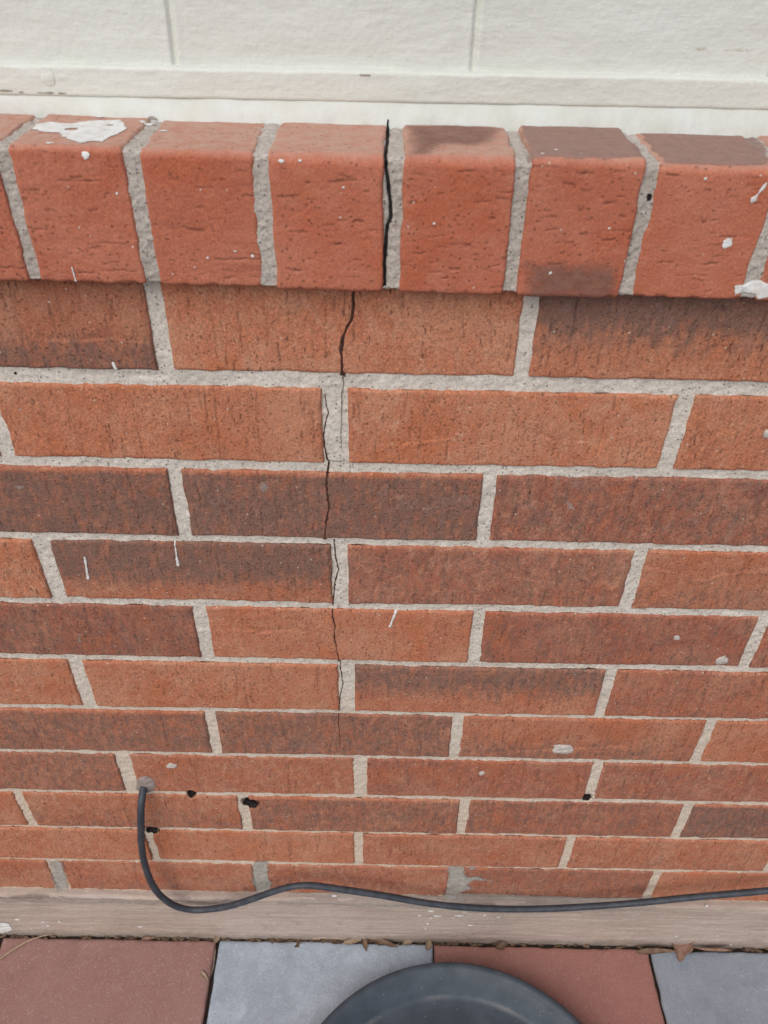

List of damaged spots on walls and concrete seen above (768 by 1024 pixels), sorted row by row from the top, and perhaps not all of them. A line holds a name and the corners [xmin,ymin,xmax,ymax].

crack [383,119,393,286]
crack [323,291,355,750]